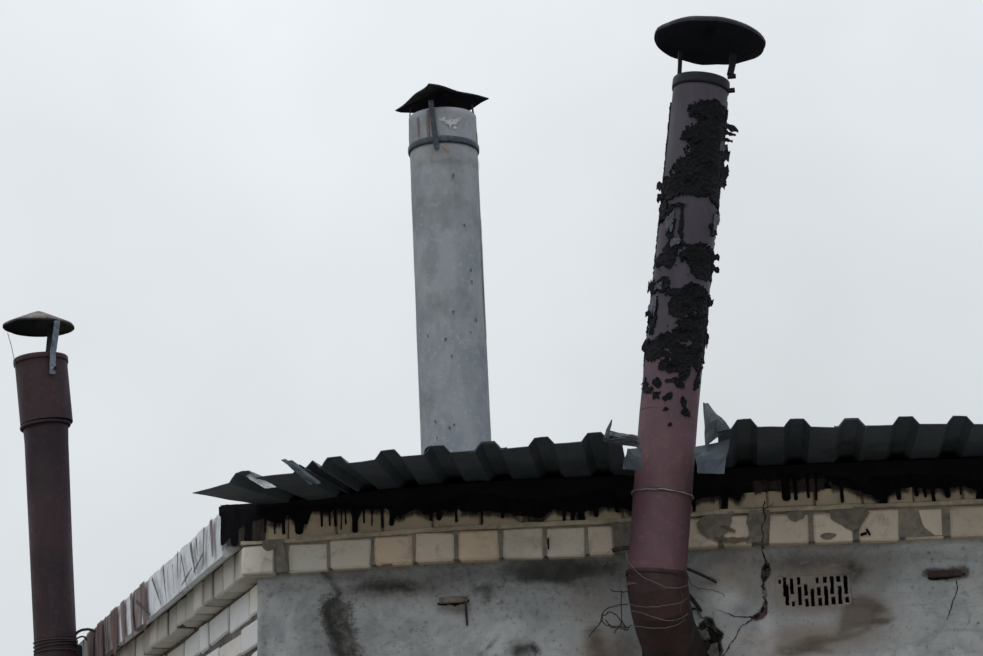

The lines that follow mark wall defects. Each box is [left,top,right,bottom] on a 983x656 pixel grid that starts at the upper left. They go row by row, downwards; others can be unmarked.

damp [152,522,217,604]
crack [719,501,773,656]